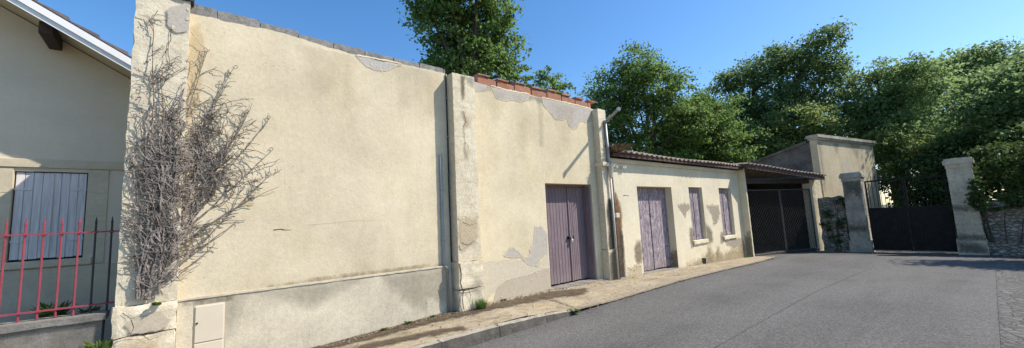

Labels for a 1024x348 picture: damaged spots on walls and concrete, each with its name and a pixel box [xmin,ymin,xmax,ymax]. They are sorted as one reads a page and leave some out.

flaking render [356,55,402,72]
flaking render [474,82,592,130]
flaking render [493,225,551,302]
leakage [607,199,642,280]